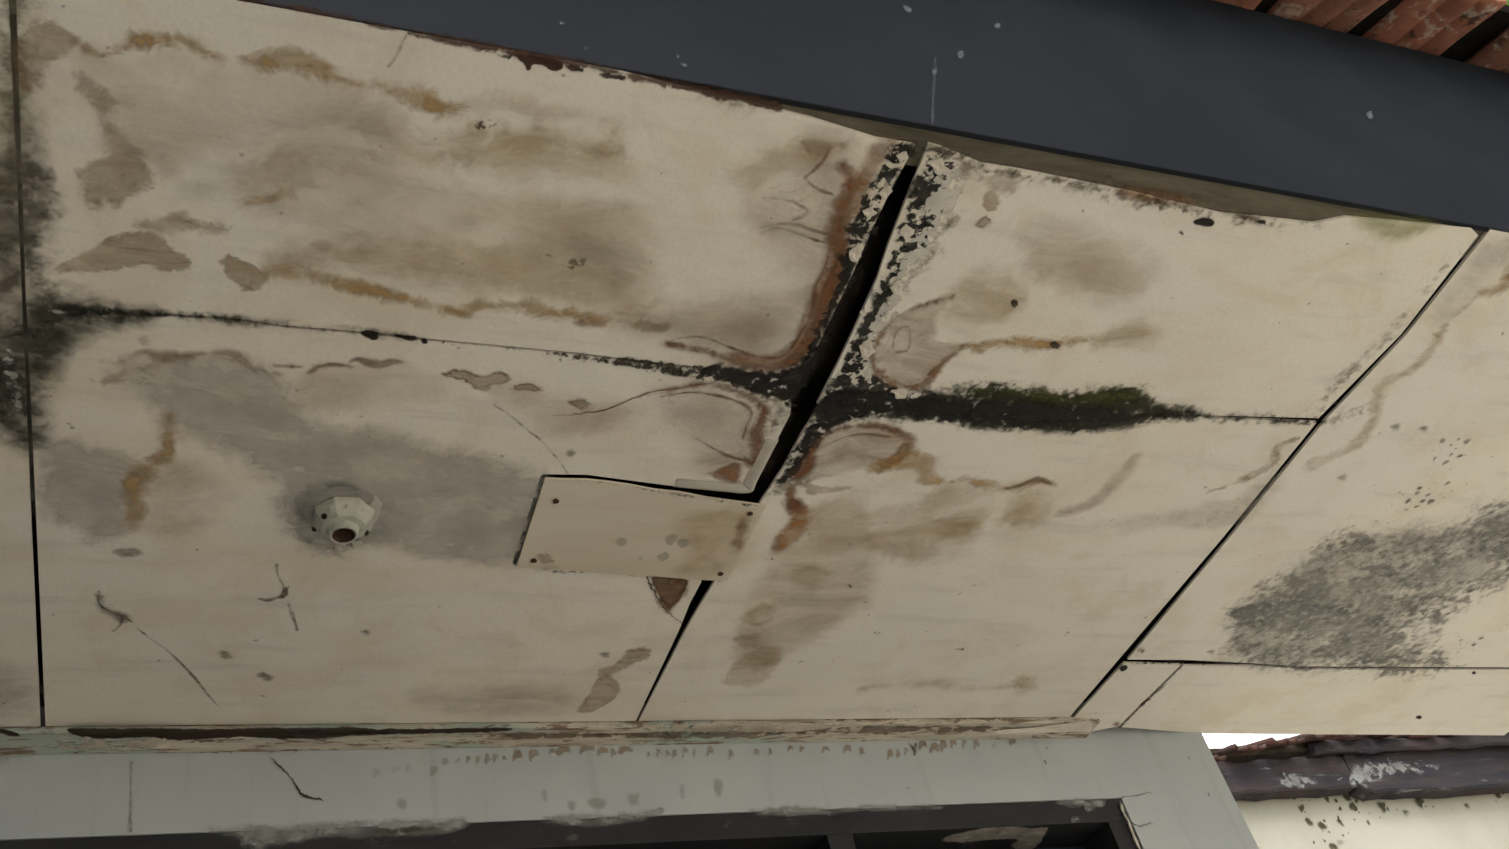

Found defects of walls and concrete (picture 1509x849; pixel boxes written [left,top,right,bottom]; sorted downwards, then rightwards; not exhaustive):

water stain [415,93,452,114]
water stain [221,254,263,290]
water stain [0,158,204,446]
water stain [332,279,416,302]
water stain [965,337,1062,353]
water stain [280,358,399,373]
water stain [442,369,540,392]
water stain [547,348,943,493]
water stain [1006,478,1052,489]
mould [1229,503,1509,677]
peeling [48,732,166,750]
peeling [505,721,1093,764]